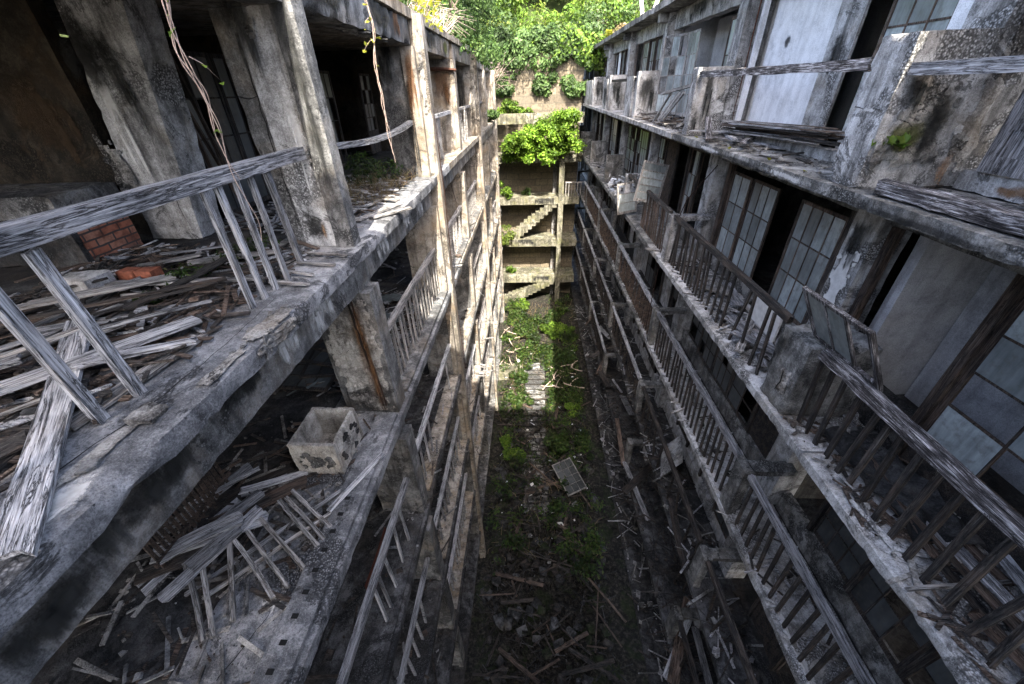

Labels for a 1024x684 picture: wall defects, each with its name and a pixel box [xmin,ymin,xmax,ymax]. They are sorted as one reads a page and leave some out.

water stain [56,15,148,129]
water stain [119,128,149,173]
water stain [904,75,927,107]
water stain [899,86,959,162]
peeling [823,251,861,304]
spalling [195,304,303,385]
rust [352,311,381,393]
water stain [92,447,194,556]
water stain [3,565,96,664]